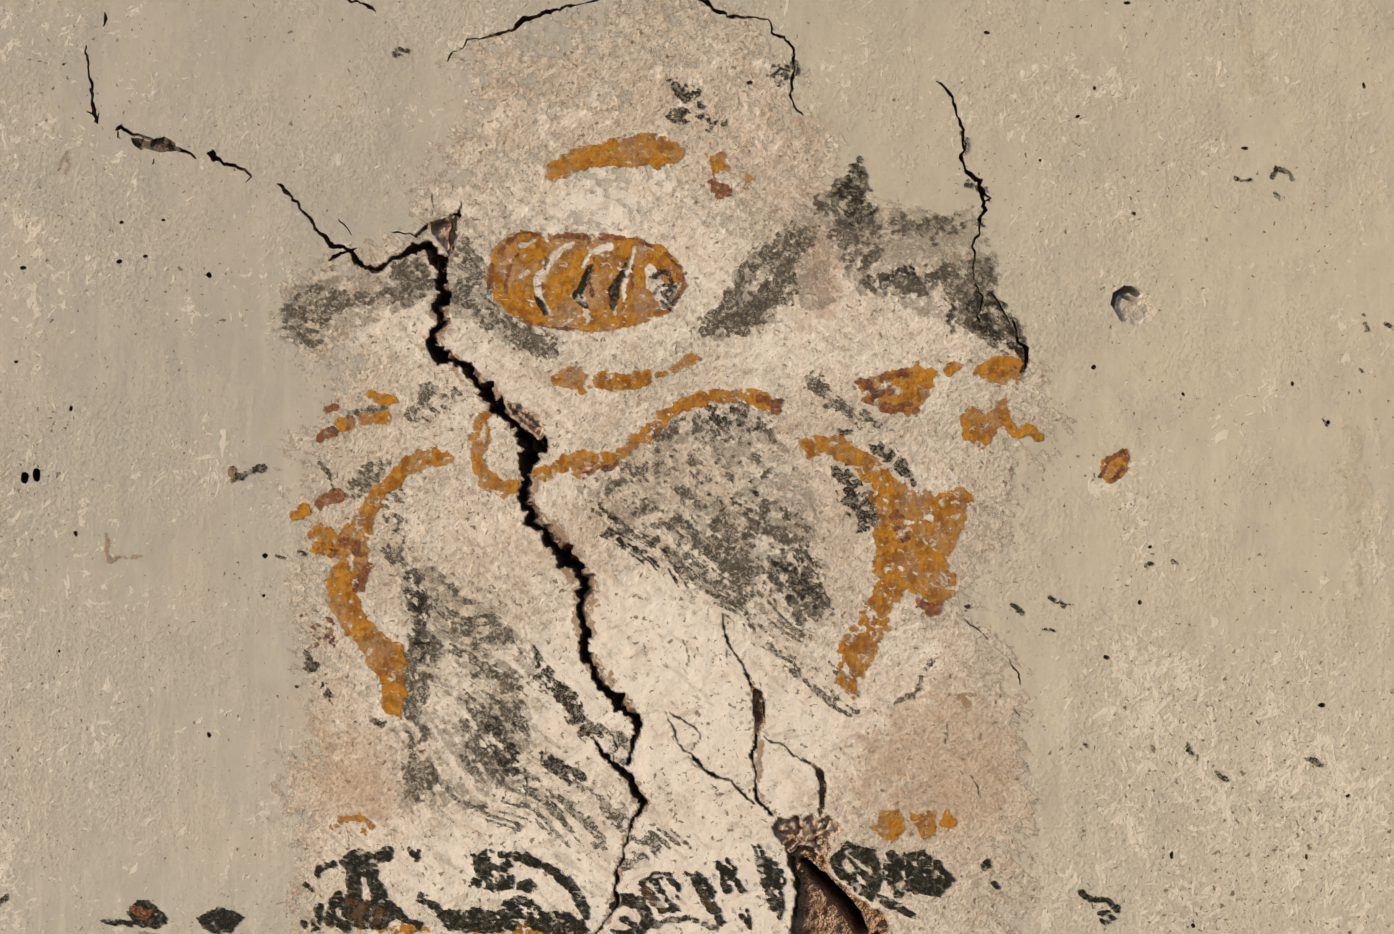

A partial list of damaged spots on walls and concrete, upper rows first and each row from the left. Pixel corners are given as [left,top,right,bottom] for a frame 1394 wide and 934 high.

crack [84,0,827,934]
peeling [258,0,1074,934]
crack [937,81,1029,371]